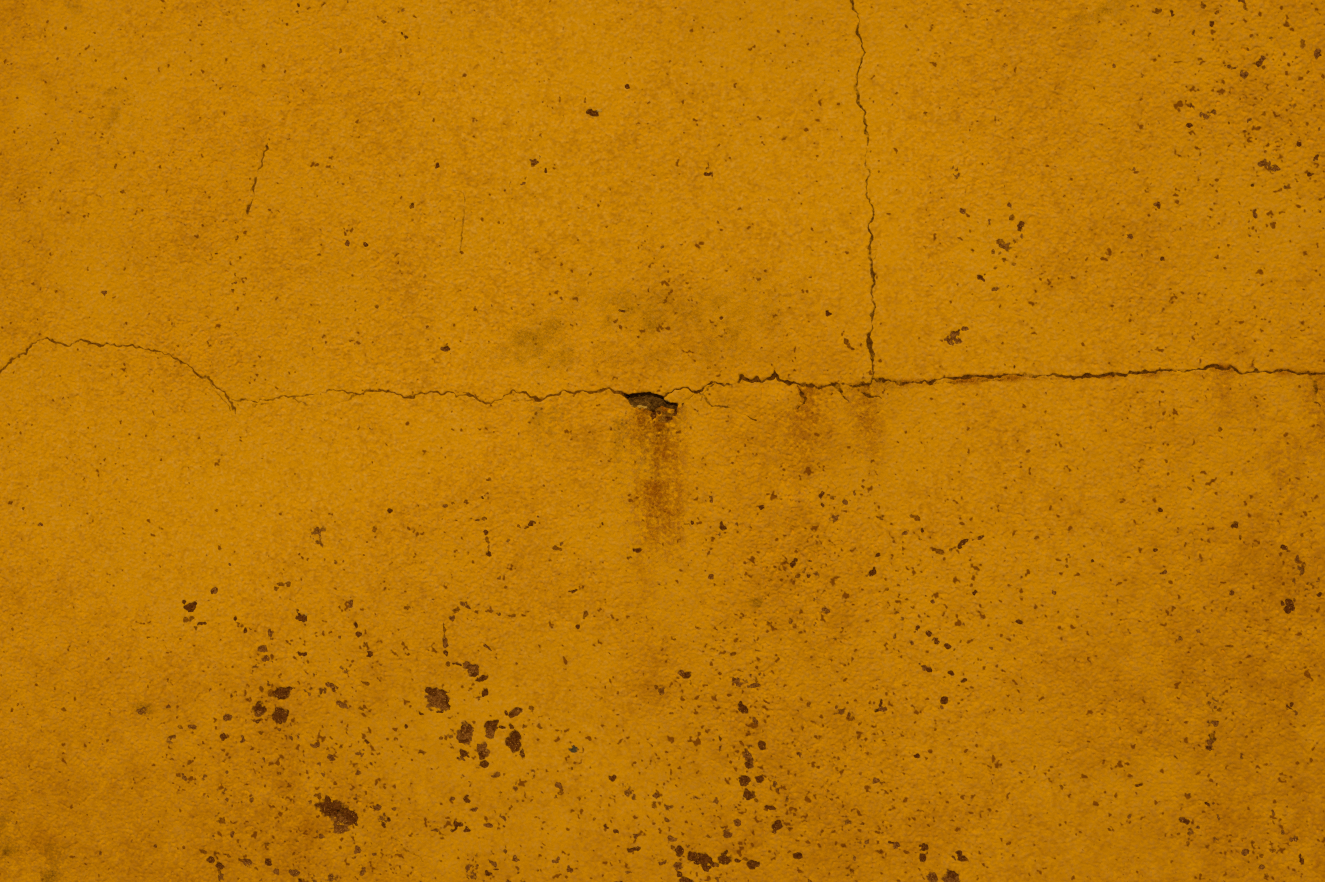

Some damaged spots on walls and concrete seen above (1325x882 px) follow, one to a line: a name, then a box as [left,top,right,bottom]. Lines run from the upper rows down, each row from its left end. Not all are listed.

crack [850,0,869,141]
crack [246,145,269,214]
crack [662,178,1325,421]
crack [0,337,628,411]
hole [628,392,678,422]
peeling [182,600,207,630]
peeling [443,601,516,700]
peeling [220,666,372,777]
peeling [419,687,450,715]
peeling [439,706,542,801]
peeling [176,757,337,882]
peeling [309,793,396,839]